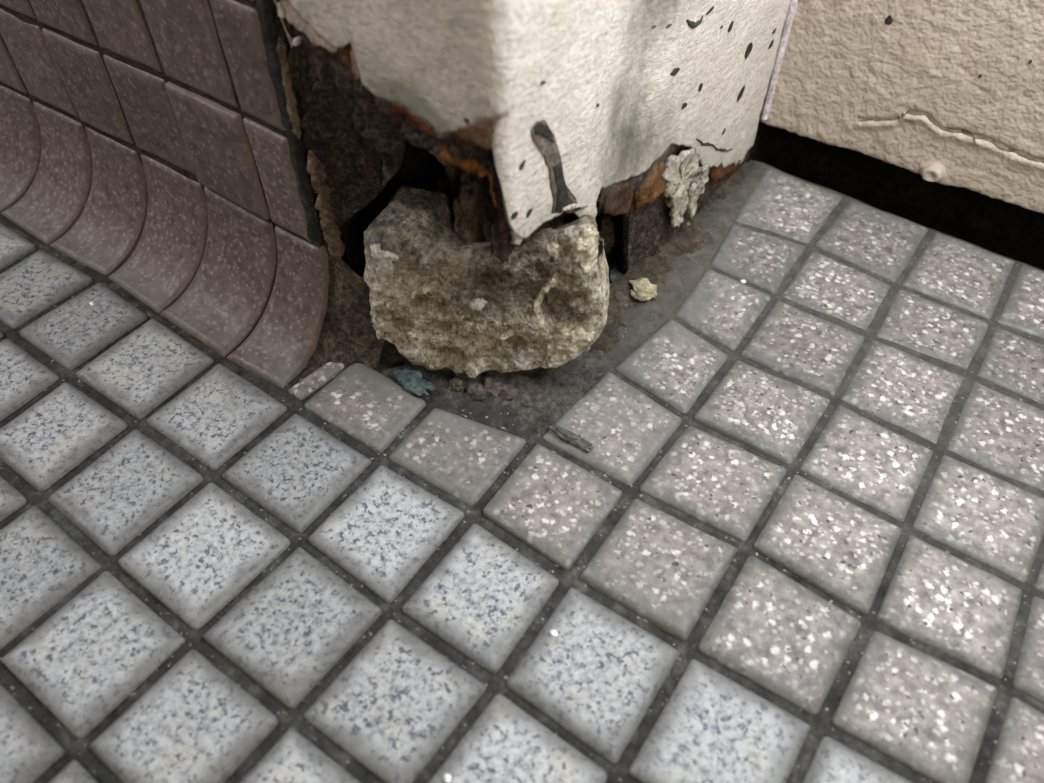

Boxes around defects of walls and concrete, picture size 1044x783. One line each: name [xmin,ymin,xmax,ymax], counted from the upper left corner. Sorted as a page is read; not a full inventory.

corrosion [375,82,507,148]
spalling [275,0,749,274]
leakage [611,88,653,163]
crack [859,111,1044,163]
corrosion [440,148,497,206]
corrosion [602,161,669,216]
corrosion [708,160,741,182]